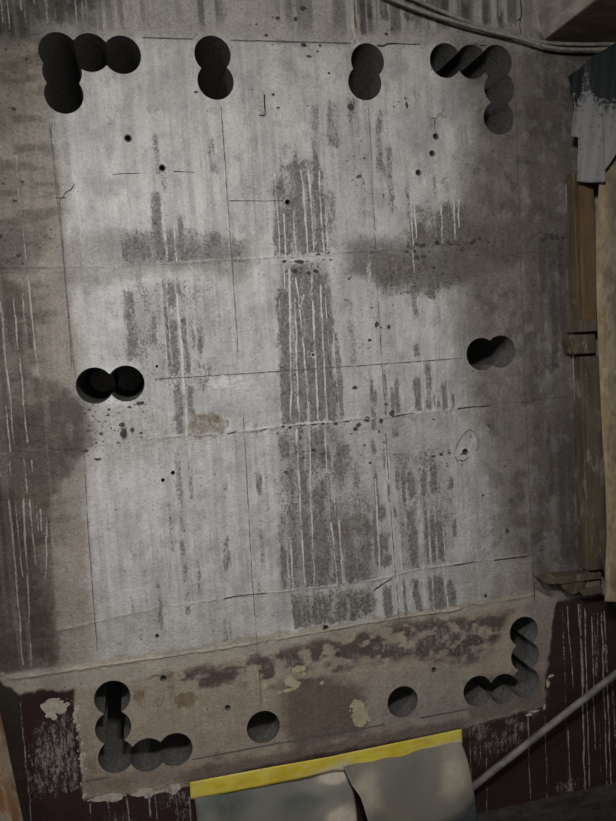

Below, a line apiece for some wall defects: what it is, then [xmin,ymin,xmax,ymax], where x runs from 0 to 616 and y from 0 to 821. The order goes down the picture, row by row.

damp [359,0,388,33]
damp [376,113,394,211]
damp [122,165,245,268]
damp [0,302,14,452]
damp [13,277,40,375]
damp [273,142,456,629]
damp [367,170,474,411]
damp [8,460,54,665]
peeling [40,696,181,802]
peeling [262,665,306,695]
spalling [349,699,371,727]
damp [563,605,615,790]